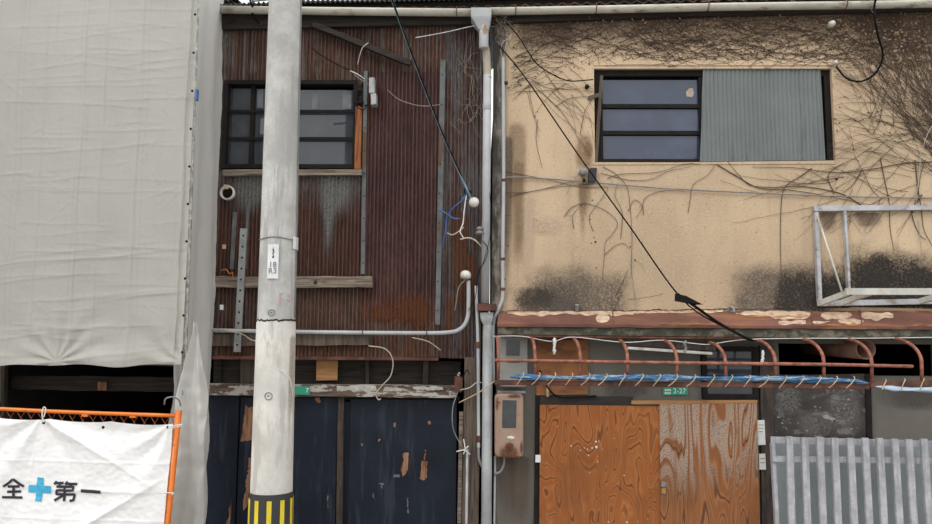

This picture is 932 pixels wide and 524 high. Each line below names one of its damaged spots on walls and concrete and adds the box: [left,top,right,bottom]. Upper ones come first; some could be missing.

water stain [237,176,262,207]
water stain [321,176,350,243]
water stain [859,213,878,225]
water stain [519,271,621,311]
water stain [736,252,932,311]
peeling [508,311,694,323]
peeling [736,311,893,325]
peeling [240,404,253,441]
peeling [393,453,409,478]
peeling [420,450,428,480]
peeling [243,458,251,511]